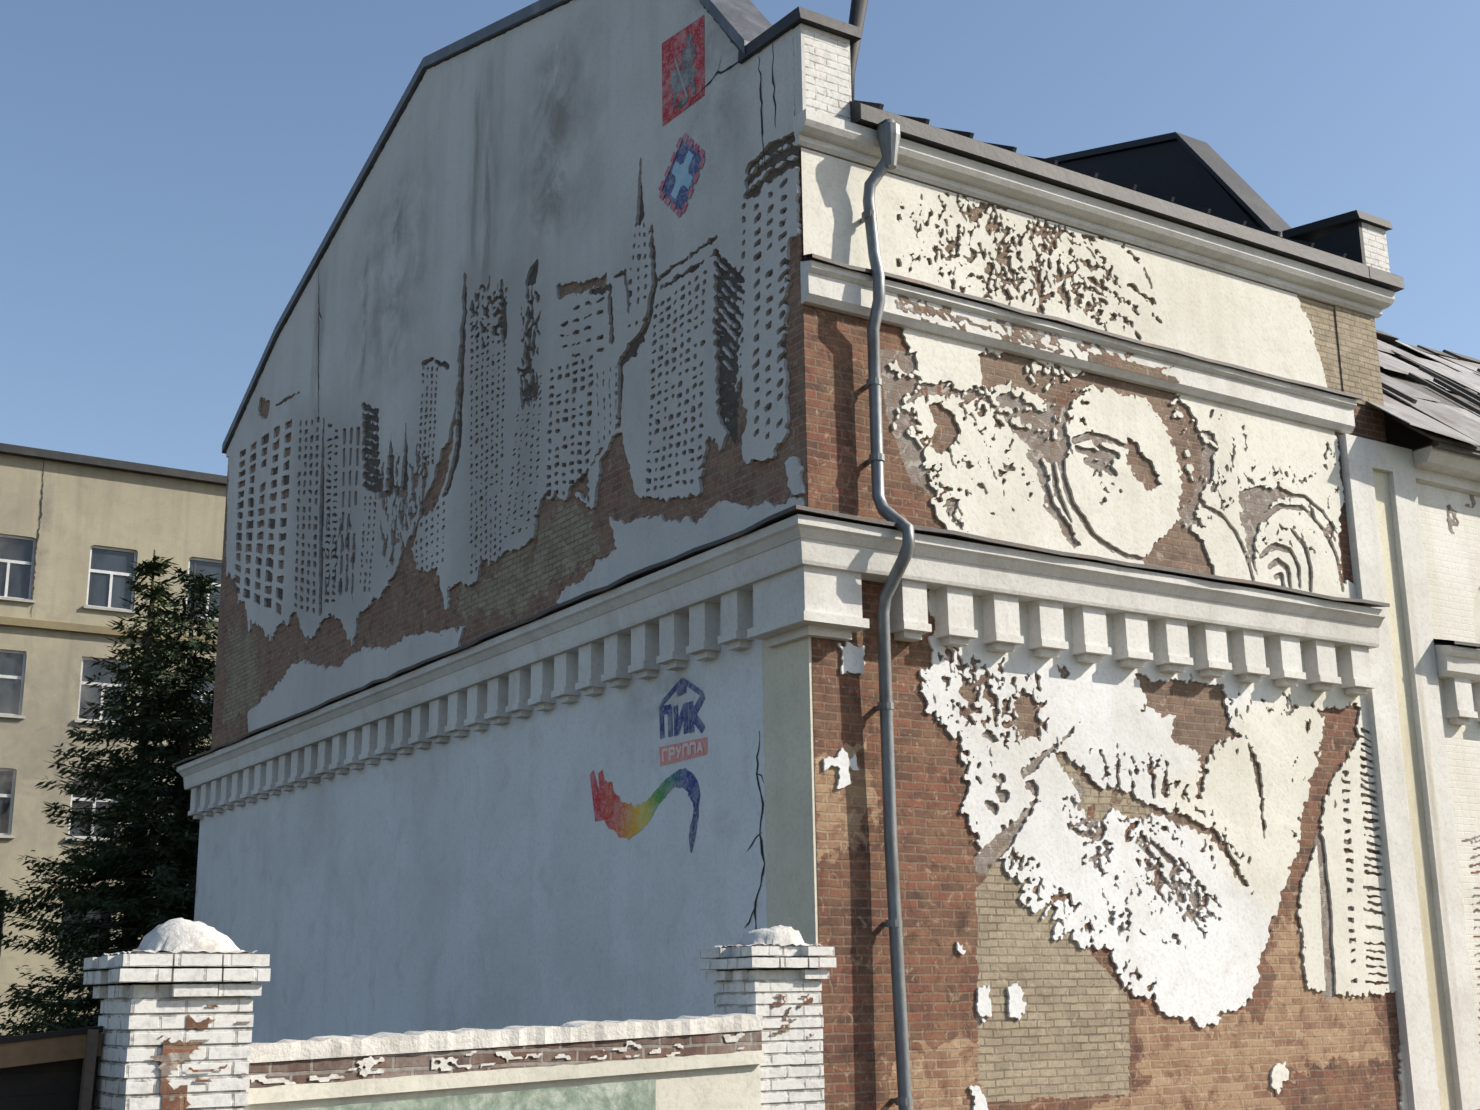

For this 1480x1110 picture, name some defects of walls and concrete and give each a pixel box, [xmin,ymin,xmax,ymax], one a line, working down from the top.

crack [684,42,776,166]
spalling [211,166,1353,749]
crack [744,733,765,930]
spalling [771,580,1400,1110]
peeling [150,1005,345,1110]
peeling [431,1050,571,1071]
peeling [590,1041,683,1060]
peeling [723,1031,745,1050]